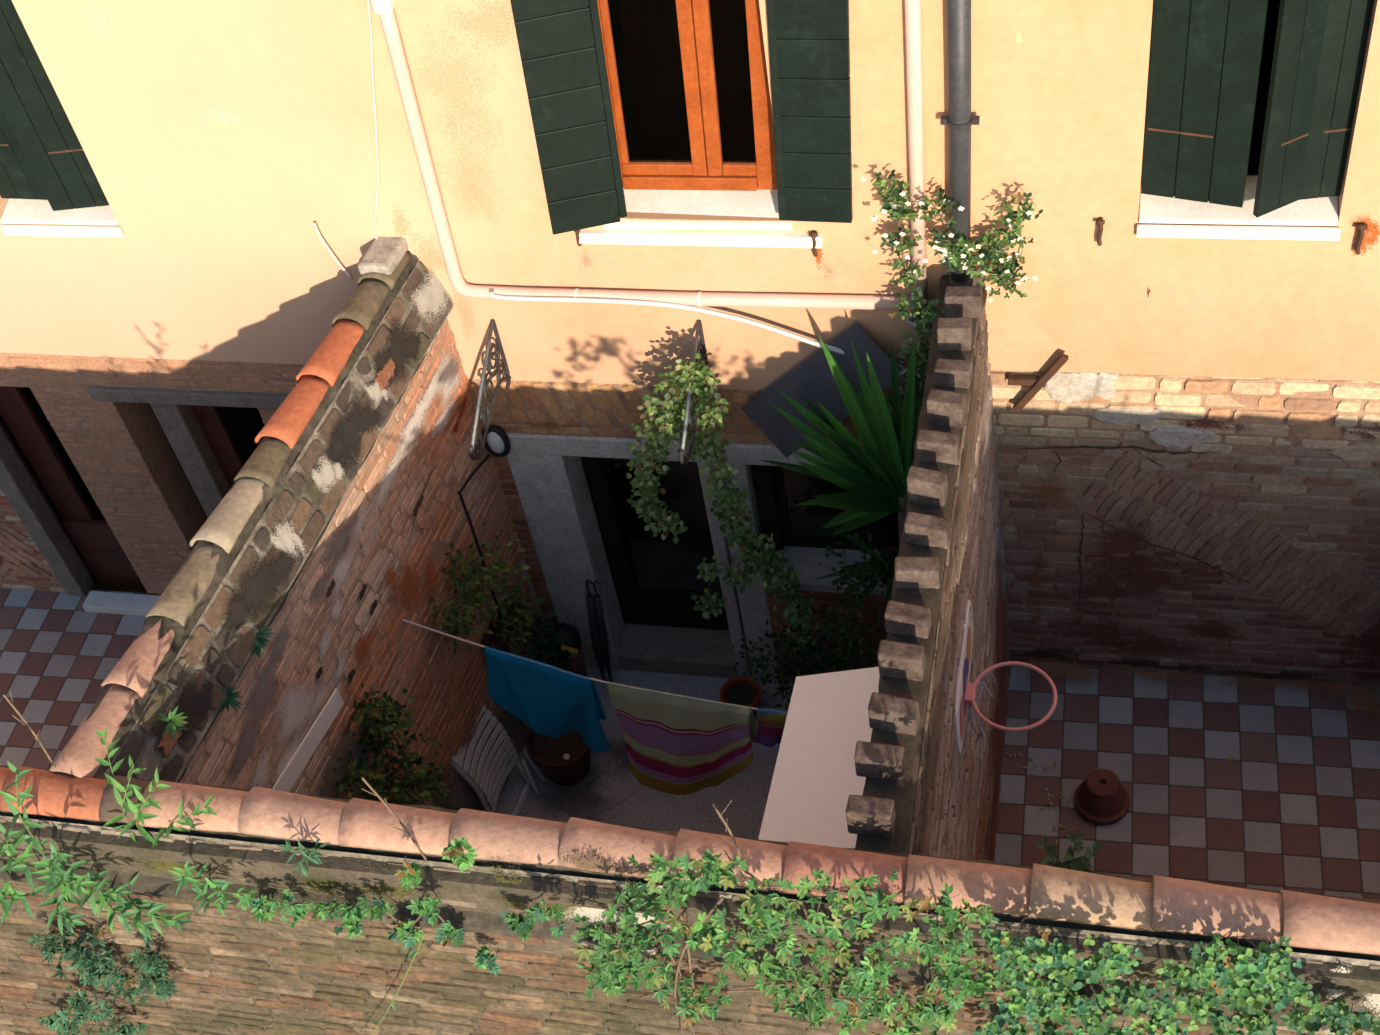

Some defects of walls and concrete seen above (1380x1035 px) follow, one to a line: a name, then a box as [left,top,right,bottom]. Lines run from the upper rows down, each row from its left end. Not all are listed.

rust [1350,214,1380,256]
peeling [1044,372,1216,448]
damp [220,198,477,789]
crack [1021,446,1221,473]
damp [1010,508,1380,684]